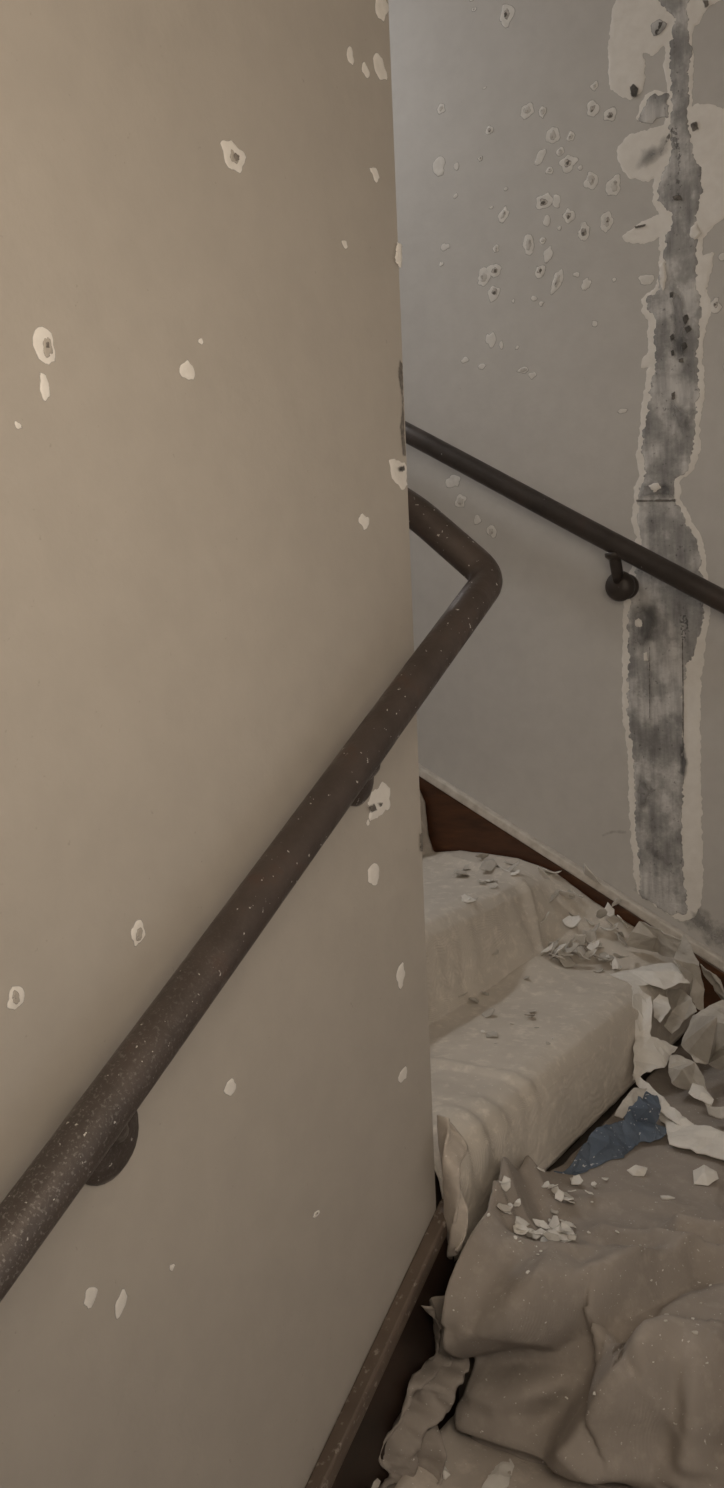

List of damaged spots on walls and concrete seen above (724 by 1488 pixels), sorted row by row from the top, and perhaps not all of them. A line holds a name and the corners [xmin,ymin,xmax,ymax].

peeling [375,0,389,22]
peeling [220,140,246,173]
peeling [520,0,724,580]
peeling [33,326,55,401]
peeling [541,565,724,1186]